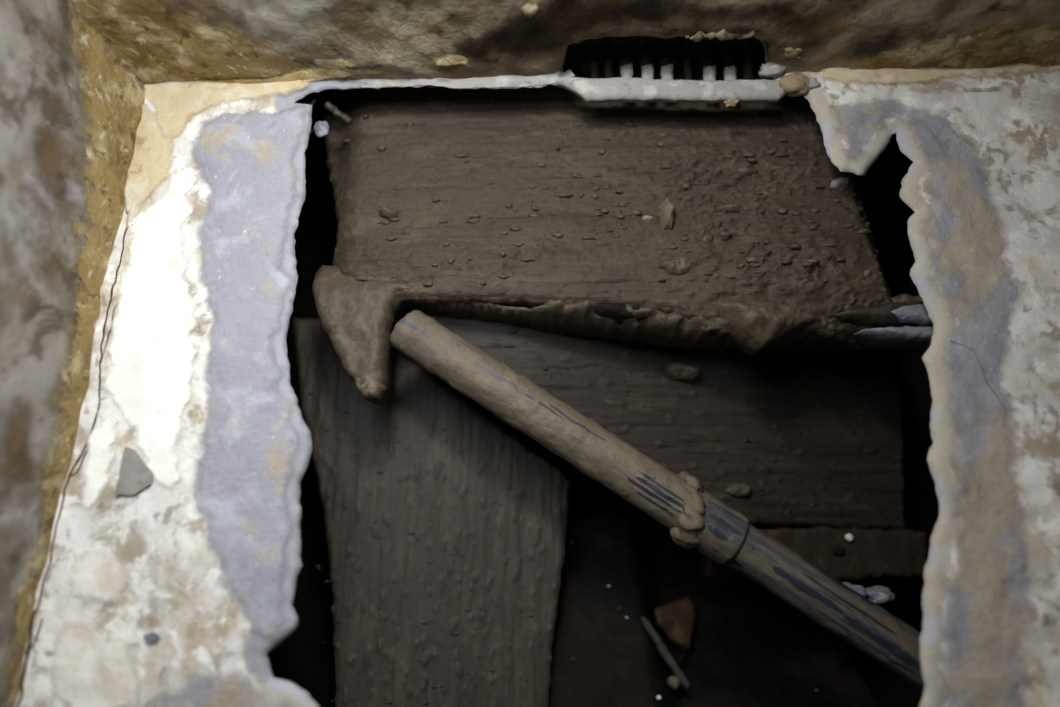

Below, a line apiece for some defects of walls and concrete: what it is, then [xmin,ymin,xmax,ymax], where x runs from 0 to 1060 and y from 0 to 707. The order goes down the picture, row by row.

flaking render [359,69,575,88]
flaking render [82,92,338,707]
flaking render [833,100,1029,707]
spalling [414,361,677,546]
peeling [69,544,128,602]
peeling [53,620,139,707]
peeling [1040,651,1060,707]